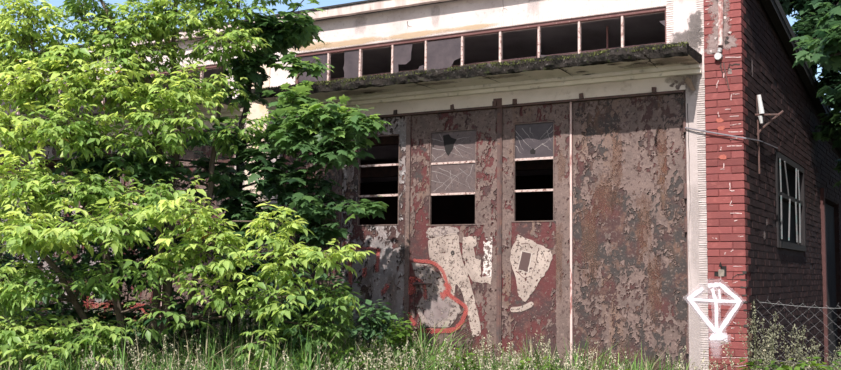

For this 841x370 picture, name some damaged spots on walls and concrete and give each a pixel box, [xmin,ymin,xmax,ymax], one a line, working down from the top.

damp [673,10,703,51]
spalling [705,0,741,58]
peeling [288,77,696,370]